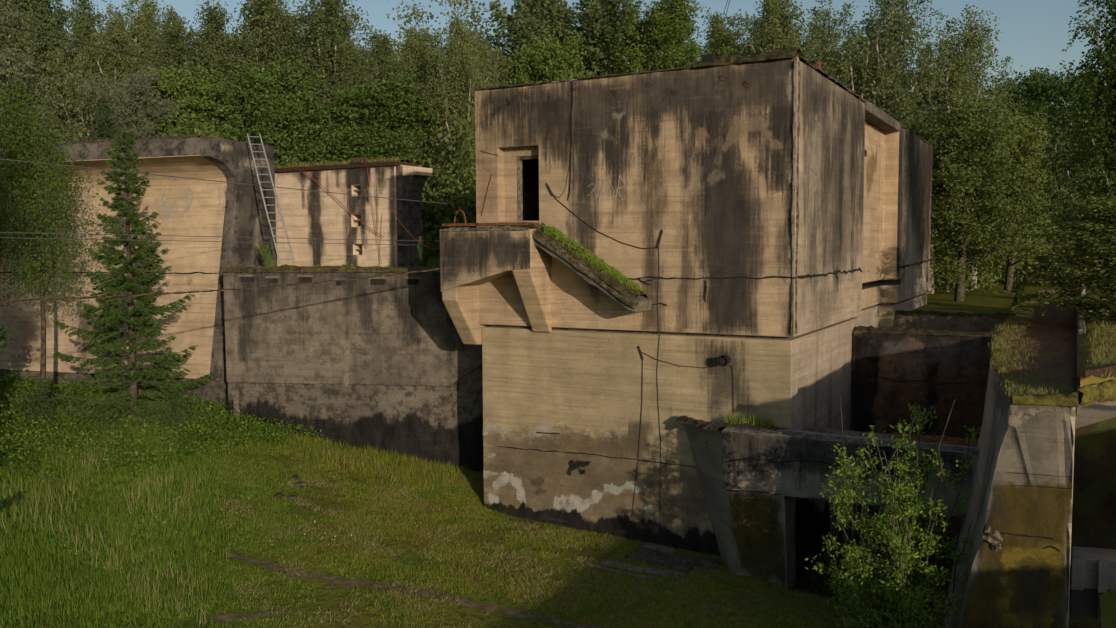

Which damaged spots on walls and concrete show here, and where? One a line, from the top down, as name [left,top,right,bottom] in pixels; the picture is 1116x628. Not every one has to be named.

leakage [239,279,255,361]
leakage [301,171,324,266]
leakage [343,167,394,332]
leakage [433,230,530,303]
leakage [482,57,864,412]
leakage [897,127,933,281]
leakage [483,423,703,533]
leakage [722,332,994,493]